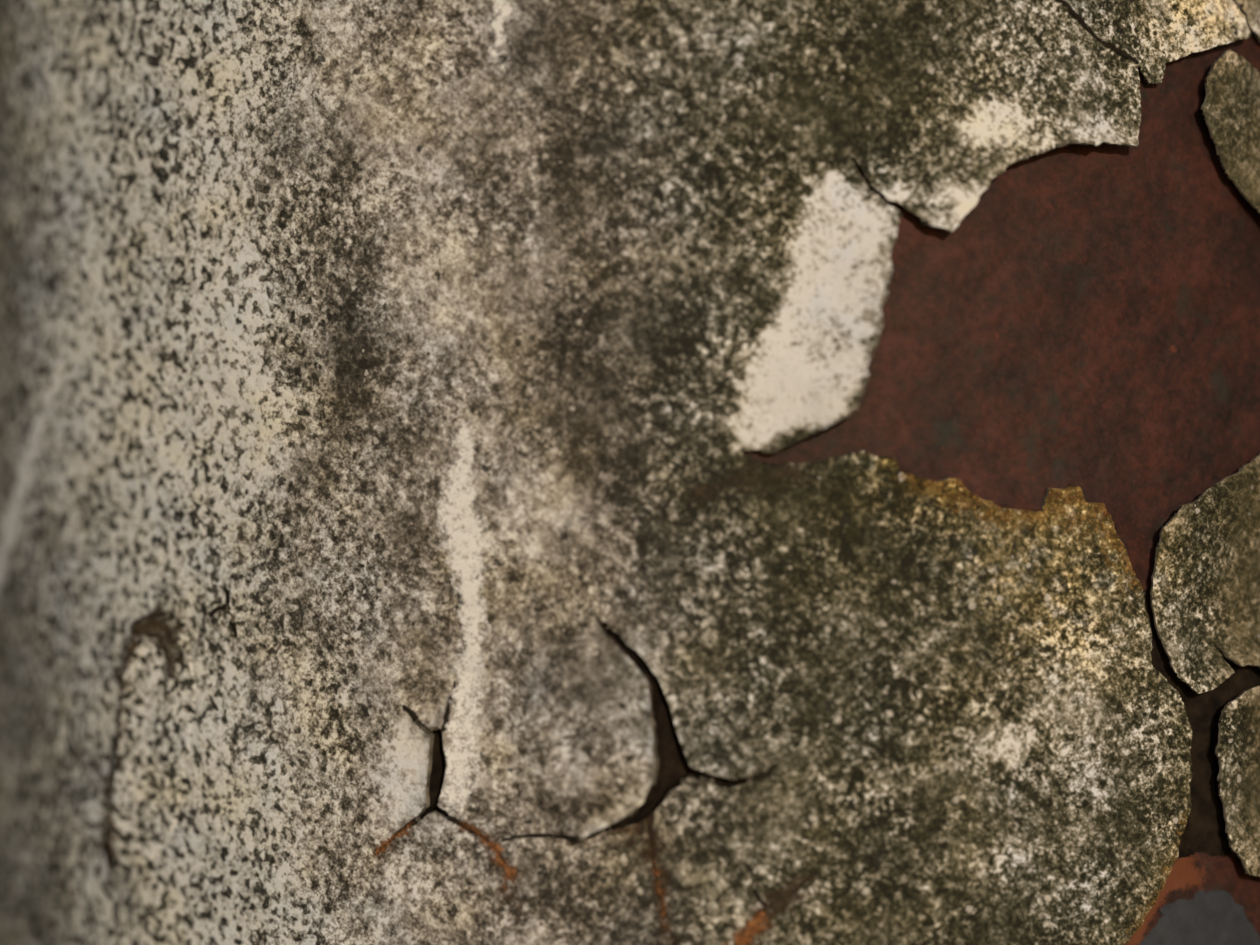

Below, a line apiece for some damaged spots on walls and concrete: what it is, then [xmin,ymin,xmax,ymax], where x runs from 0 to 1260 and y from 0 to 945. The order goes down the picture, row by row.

damp [487,0,519,75]
damp [436,420,492,816]
peeling [734,0,1260,945]
crack [377,623,778,918]
corrosion [724,874,817,945]